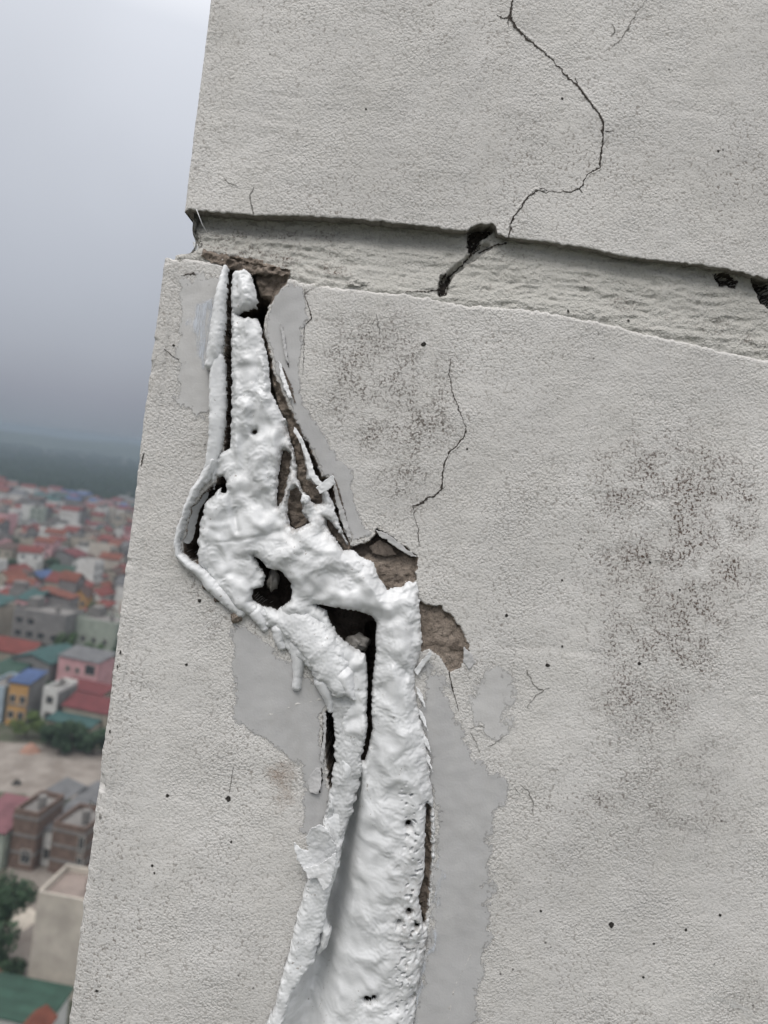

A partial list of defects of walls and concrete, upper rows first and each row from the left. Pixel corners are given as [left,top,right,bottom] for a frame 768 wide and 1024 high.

crack [497,0,614,238]
spalling [201,249,290,276]
crack [223,256,352,550]
crack [412,359,467,546]
crack [182,476,227,564]
crack [252,557,292,610]
spalling [349,529,418,590]
crack [317,604,377,760]
spalling [414,601,475,675]
crack [268,698,336,795]
peeling [294,800,337,891]
crack [406,803,432,926]